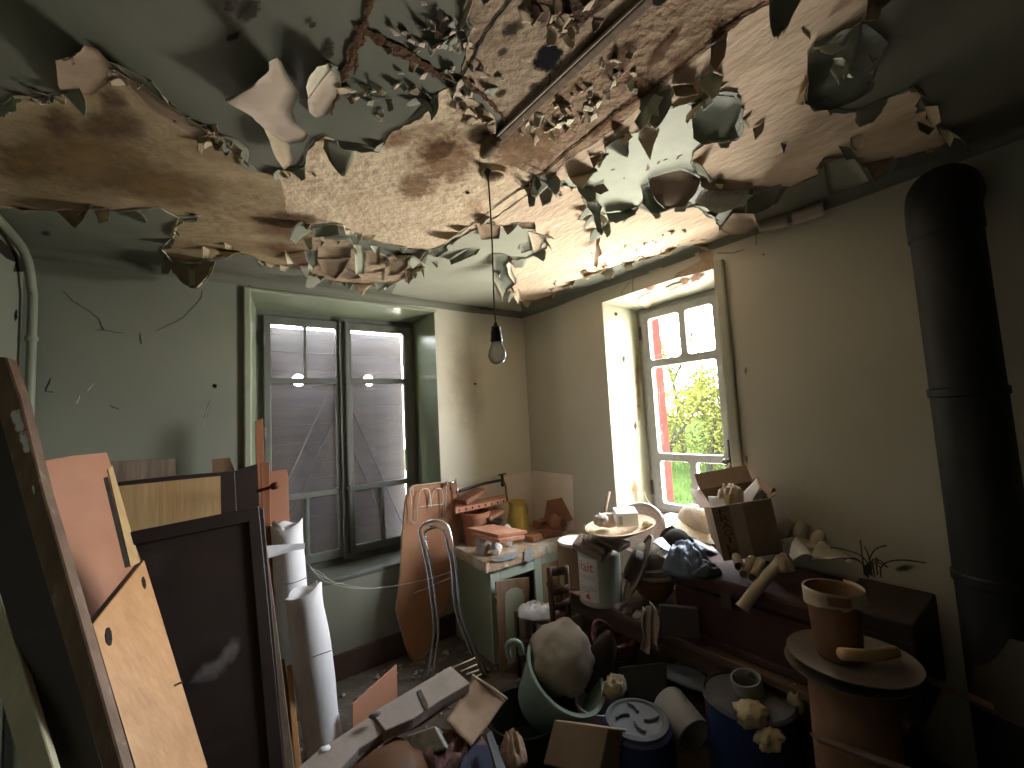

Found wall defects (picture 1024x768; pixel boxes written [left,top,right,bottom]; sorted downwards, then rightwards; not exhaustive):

crack [330,0,512,122]
damp [0,91,203,203]
peeling [0,0,970,309]
crack [388,2,769,251]
crack [64,292,202,344]